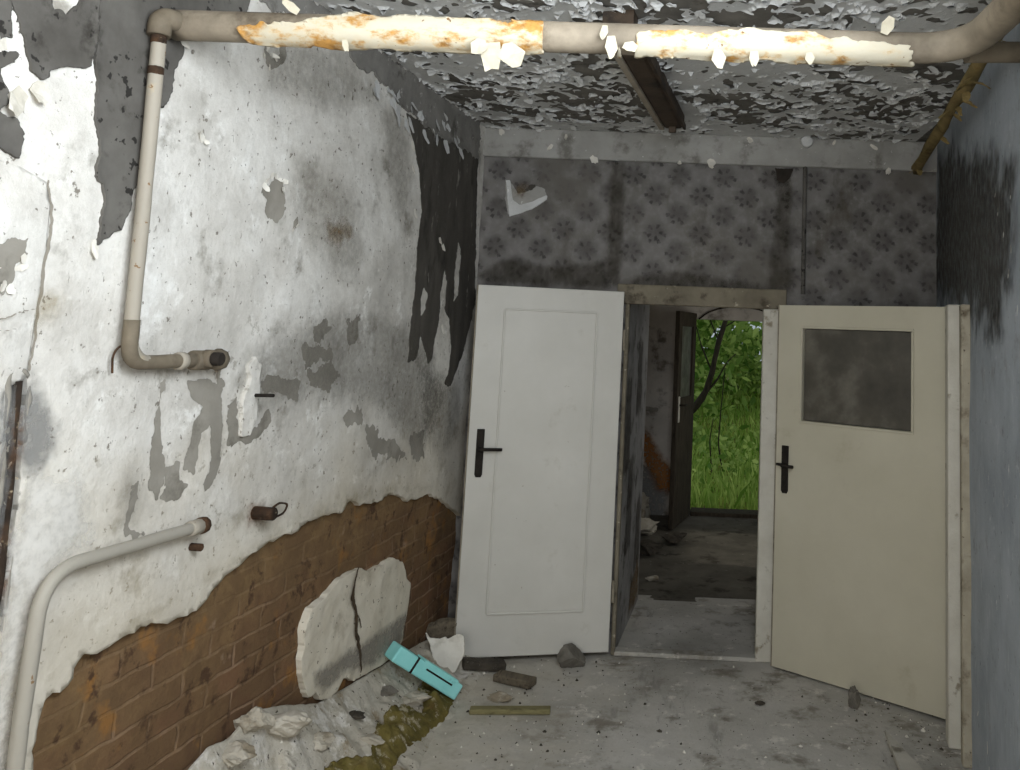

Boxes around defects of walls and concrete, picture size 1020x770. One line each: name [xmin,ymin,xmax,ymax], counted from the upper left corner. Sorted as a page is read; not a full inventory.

peeling [0,81,51,118]
peeling [236,0,992,159]
flaking render [346,315,361,345]
flaking render [123,318,341,539]
flaking render [343,406,425,463]
flaking render [32,494,456,770]
crack [351,567,362,673]